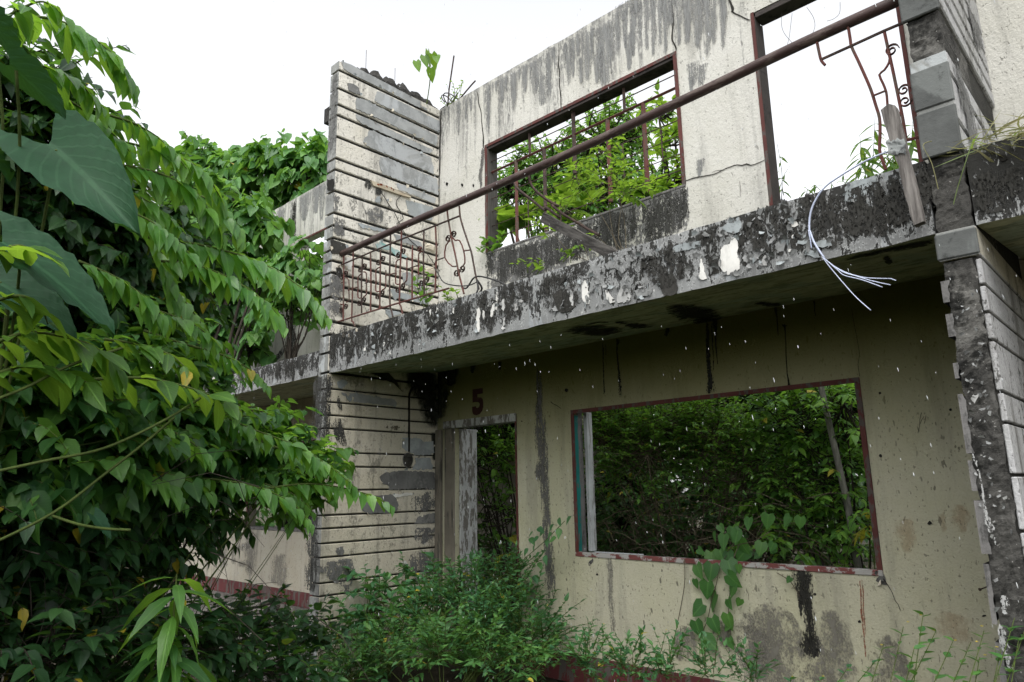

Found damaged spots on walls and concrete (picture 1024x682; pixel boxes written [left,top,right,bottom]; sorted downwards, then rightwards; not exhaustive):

leakage [328,74,338,150]
leakage [486,0,727,127]
spalling [329,239,352,278]
peeling [358,223,423,258]
peeling [552,201,833,313]
crack [686,160,764,191]
peeling [843,176,877,203]
peeling [341,272,524,362]
leakage [312,187,690,460]
leakage [534,368,556,598]
spalling [944,258,1024,682]
leakage [718,570,911,682]